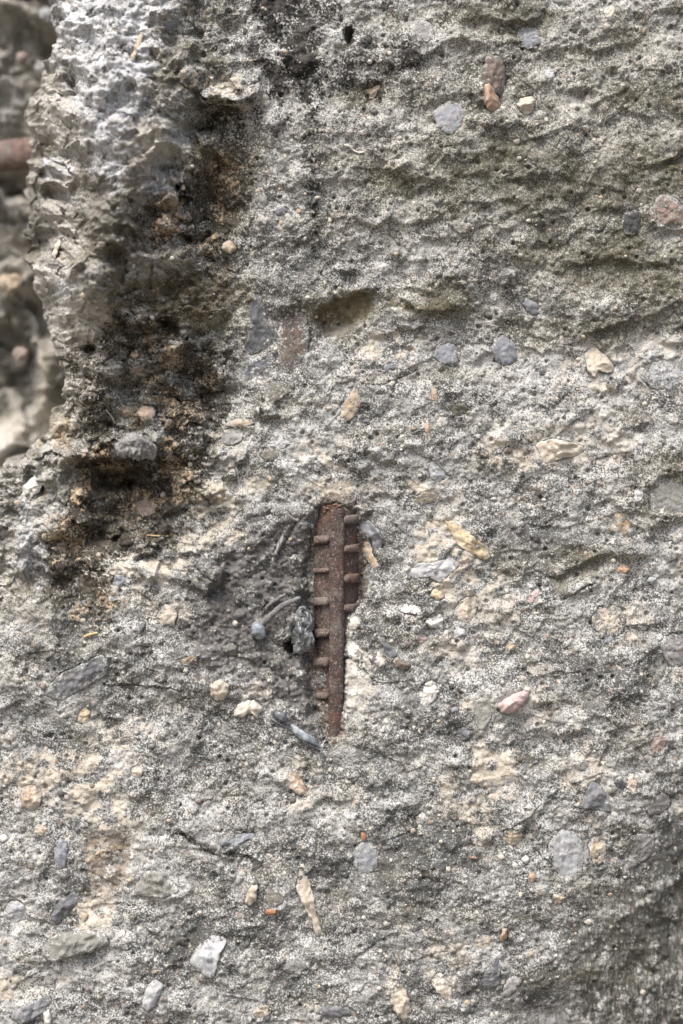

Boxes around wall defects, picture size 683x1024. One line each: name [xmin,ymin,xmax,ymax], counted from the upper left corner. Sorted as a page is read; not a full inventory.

water stain [11,0,425,642]
spalling [173,489,336,746]
rust [308,492,365,744]
peeling [344,616,386,727]